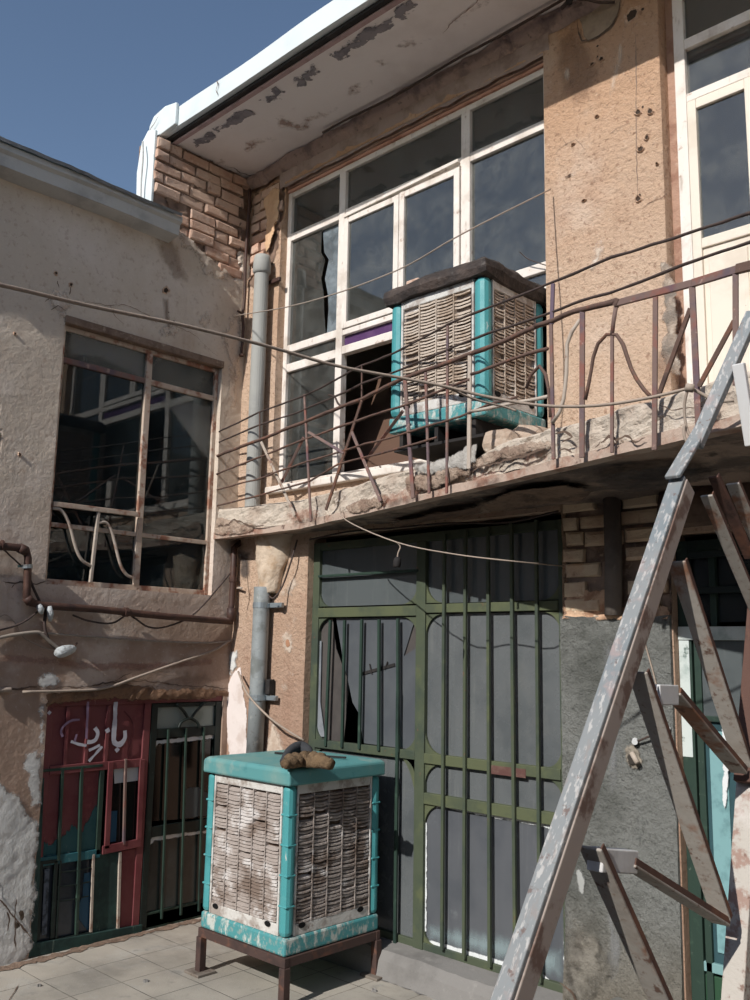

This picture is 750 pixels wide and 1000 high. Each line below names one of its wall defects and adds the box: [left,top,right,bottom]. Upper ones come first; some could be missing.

flaking render [329,0,418,61]
flaking render [259,87,285,103]
flaking render [294,64,320,87]
flaking render [153,109,285,288]
spalling [661,262,680,375]
spalling [405,441,550,492]
flaking render [0,650,247,966]